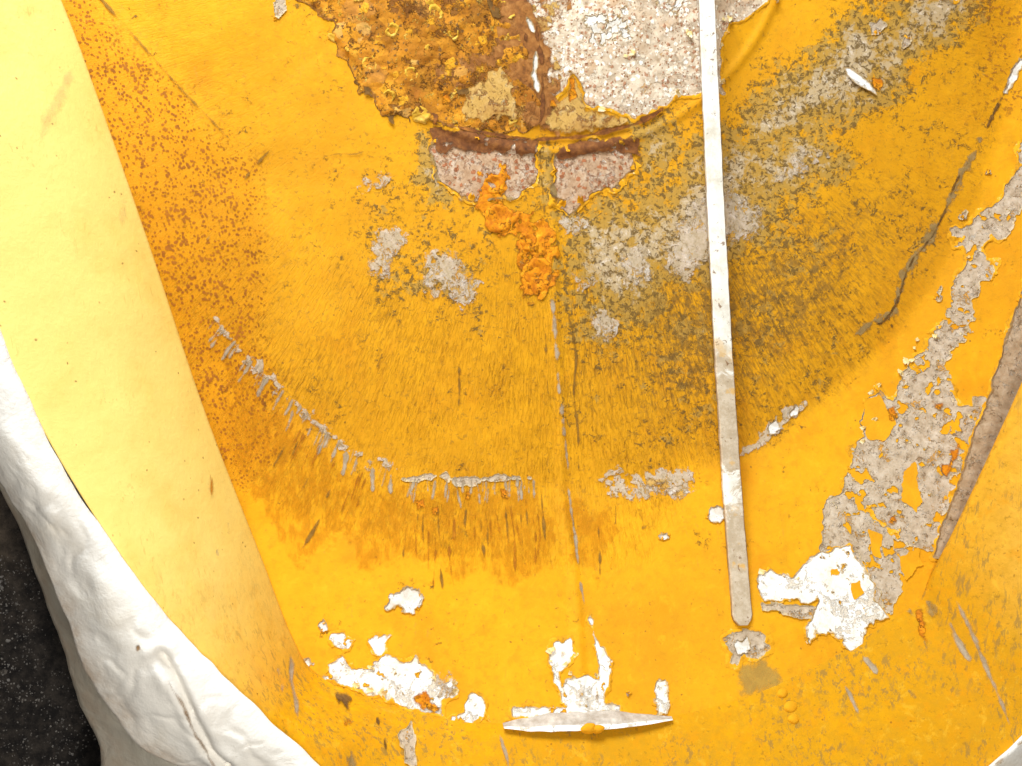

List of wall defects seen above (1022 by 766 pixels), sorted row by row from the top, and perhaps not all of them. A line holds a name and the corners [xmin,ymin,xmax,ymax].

corrosion [435,0,628,137]
peeling [527,0,702,123]
peeling [715,0,779,98]
corrosion [475,163,560,305]
peeling [427,116,641,236]
crack [855,58,1022,335]
peeling [209,316,535,515]
peeling [755,140,1022,651]
peeling [598,465,695,501]
peeling [318,619,491,724]
peeling [504,612,632,721]
peeling [652,678,670,716]